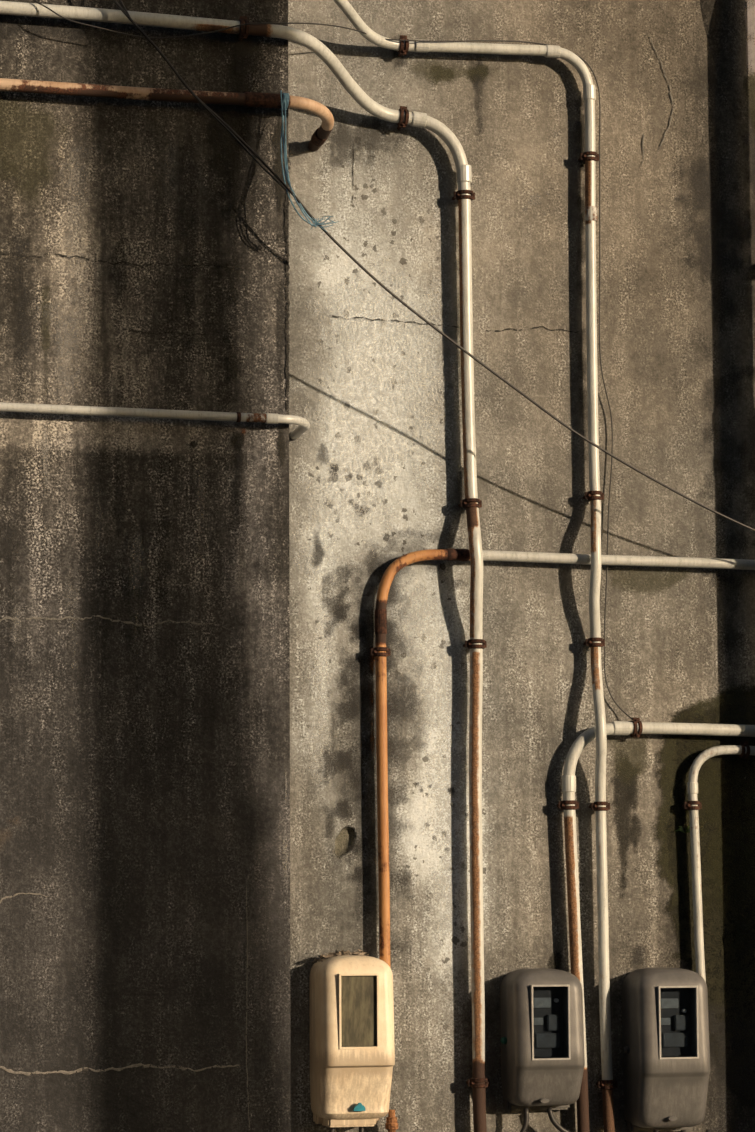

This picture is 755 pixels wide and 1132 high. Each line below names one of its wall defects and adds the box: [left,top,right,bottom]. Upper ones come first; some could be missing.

damp [0,0,269,314]
damp [675,138,749,332]
crack [283,158,291,410]
crack [332,315,458,328]
crack [486,325,579,333]
damp [230,432,245,524]
damp [277,429,287,461]
damp [314,536,323,565]
crack [0,615,216,628]
damp [323,567,351,637]
damp [327,799,351,837]
crack [0,885,250,1132]